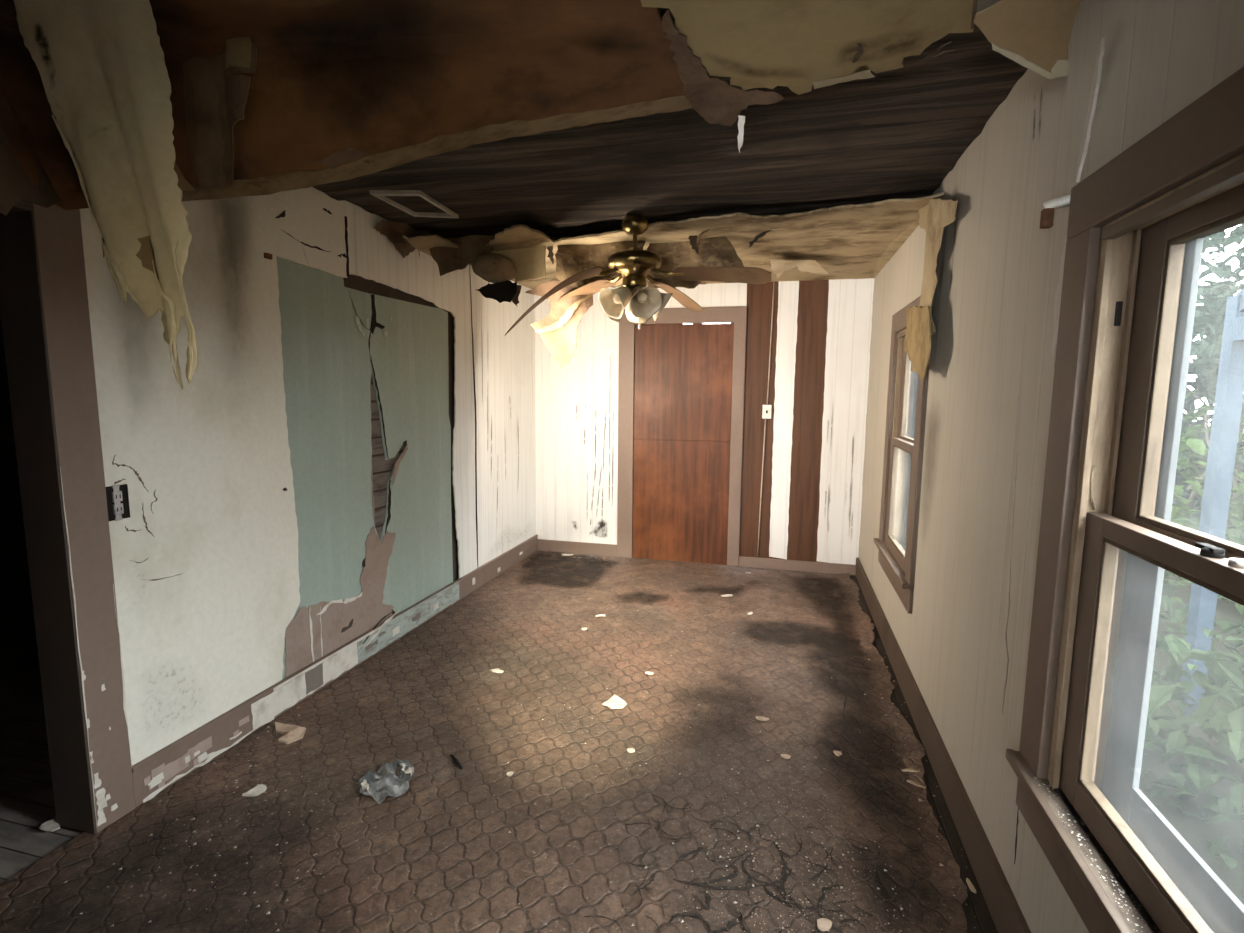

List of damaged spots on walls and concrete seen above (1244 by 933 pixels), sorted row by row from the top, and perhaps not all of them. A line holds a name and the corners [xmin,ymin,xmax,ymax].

leakage [0,0,53,102]
peeling [769,259,832,278]
peeling [60,467,118,826]
peeling [113,584,132,766]
crack [112,455,183,581]
peeling [143,526,475,803]
leakage [522,551,617,587]
leakage [625,592,665,602]
leakage [747,577,922,855]
leakage [24,826,319,933]
crack [584,794,880,933]
leakage [860,853,905,928]